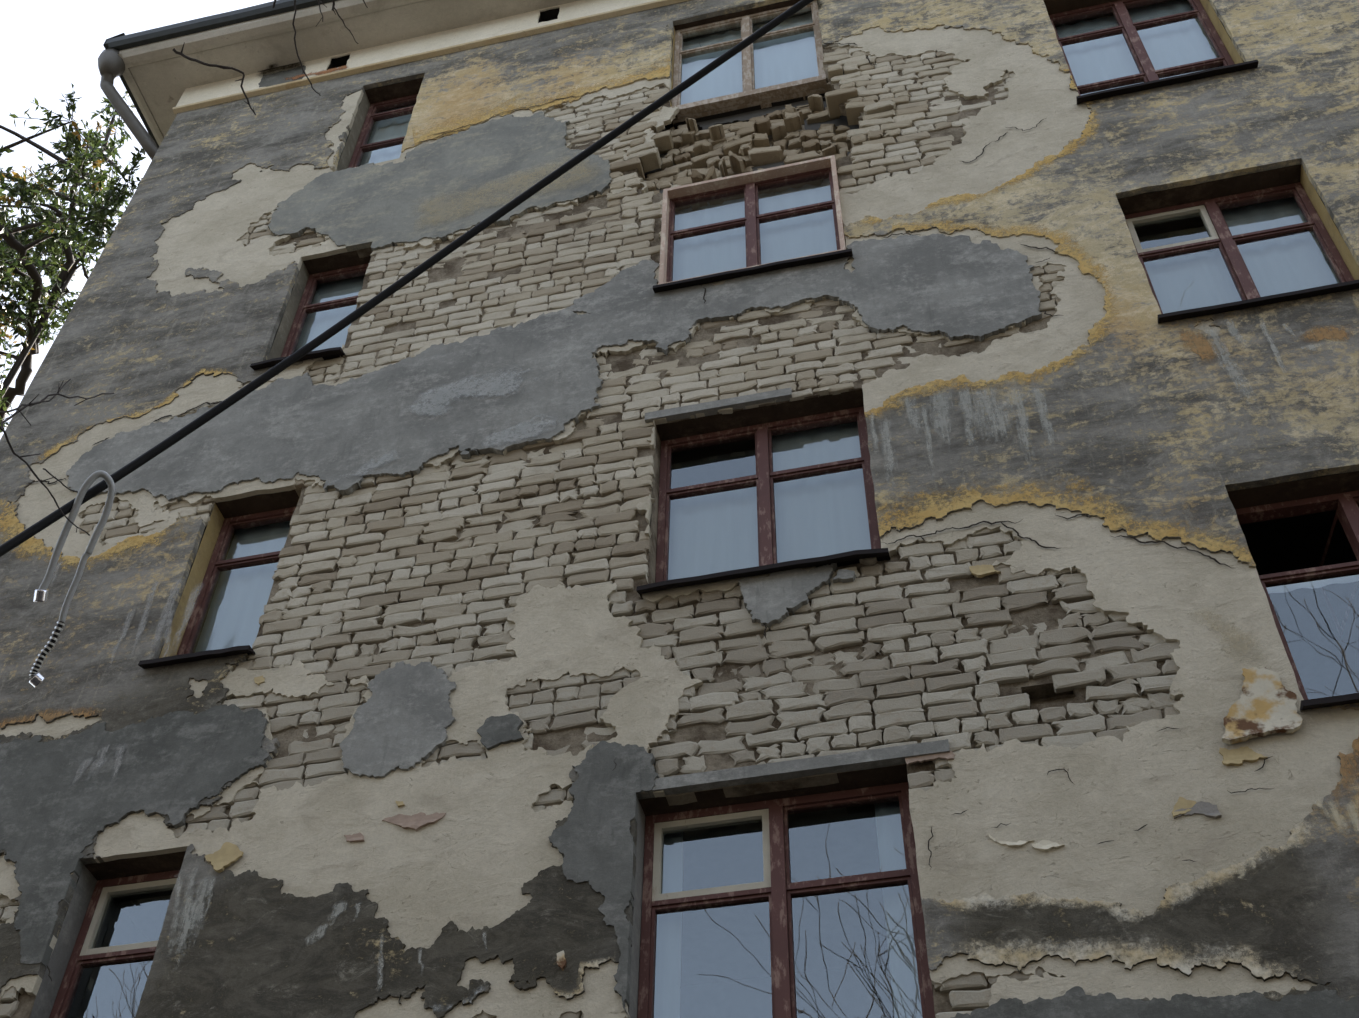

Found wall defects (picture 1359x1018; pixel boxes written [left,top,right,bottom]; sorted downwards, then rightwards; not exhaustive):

flaking render [374,59,679,166]
flaking render [823,26,1099,226]
flaking render [0,90,663,542]
damp [905,389,1052,459]
flaking render [13,513,70,560]
flaking render [59,493,108,569]
flaking render [87,221,1359,951]
damp [1316,801,1359,831]
flaking render [0,854,22,925]
flaking render [0,975,42,1018]
flaking render [355,950,630,1018]
flaking render [930,940,1328,1018]